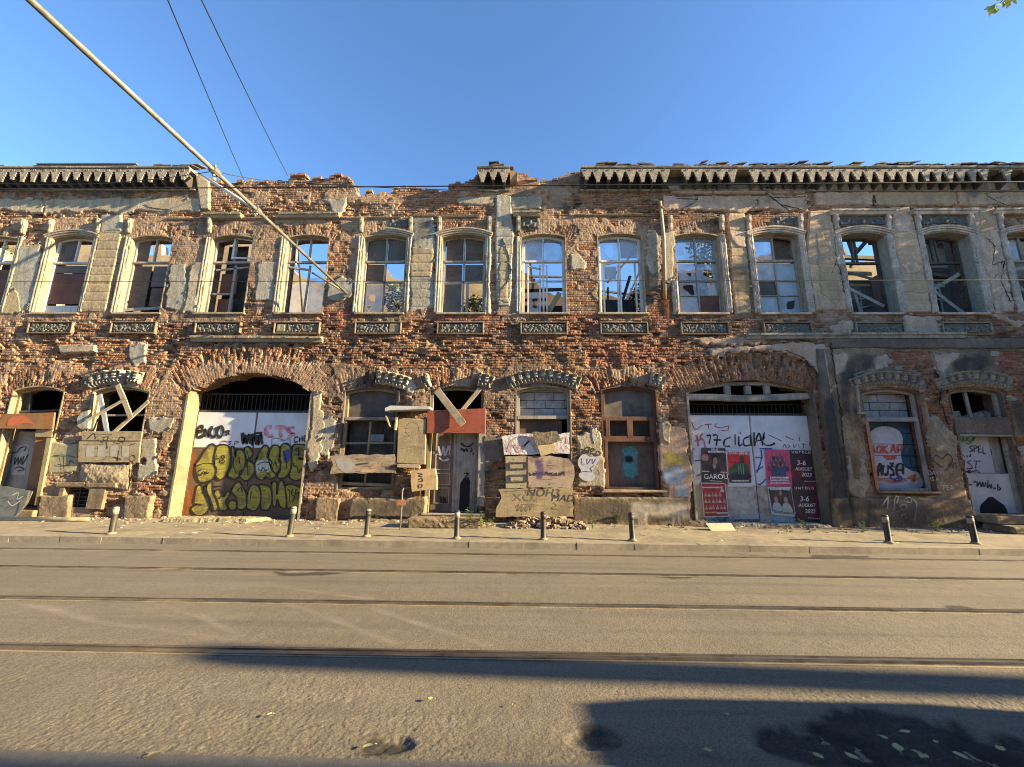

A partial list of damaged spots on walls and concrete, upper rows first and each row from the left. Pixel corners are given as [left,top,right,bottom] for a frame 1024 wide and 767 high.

peeling [0,196,202,232]
peeling [0,241,42,314]
peeling [165,262,204,314]
spalling [321,276,371,330]
peeling [403,213,497,337]
spalling [569,311,682,367]
peeling [645,229,675,291]
peeling [691,336,848,393]
peeling [662,188,1024,328]
crack [975,237,1013,309]
peeling [306,391,338,472]
spalling [873,351,960,455]